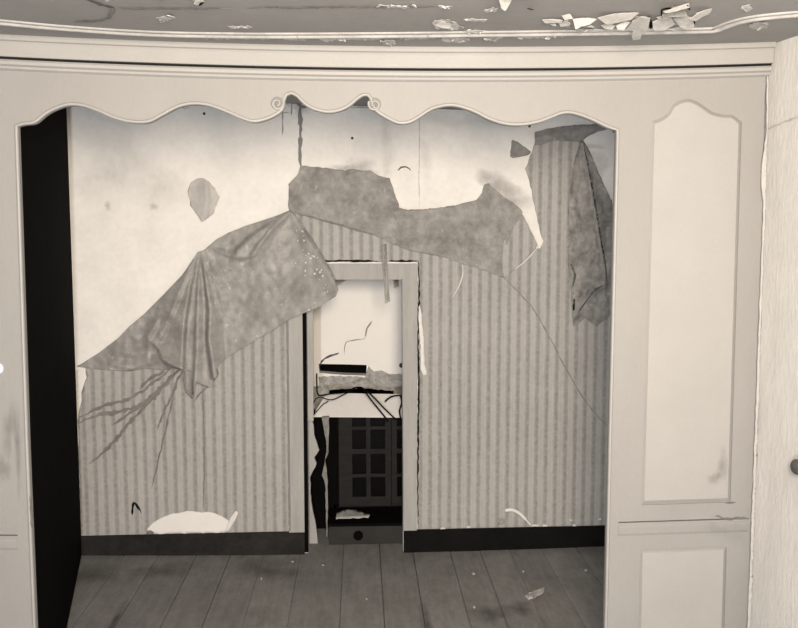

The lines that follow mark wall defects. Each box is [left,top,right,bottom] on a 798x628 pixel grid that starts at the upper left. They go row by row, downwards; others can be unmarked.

crack [74,0,433,23]
peeling [320,0,511,47]
peeling [516,3,712,40]